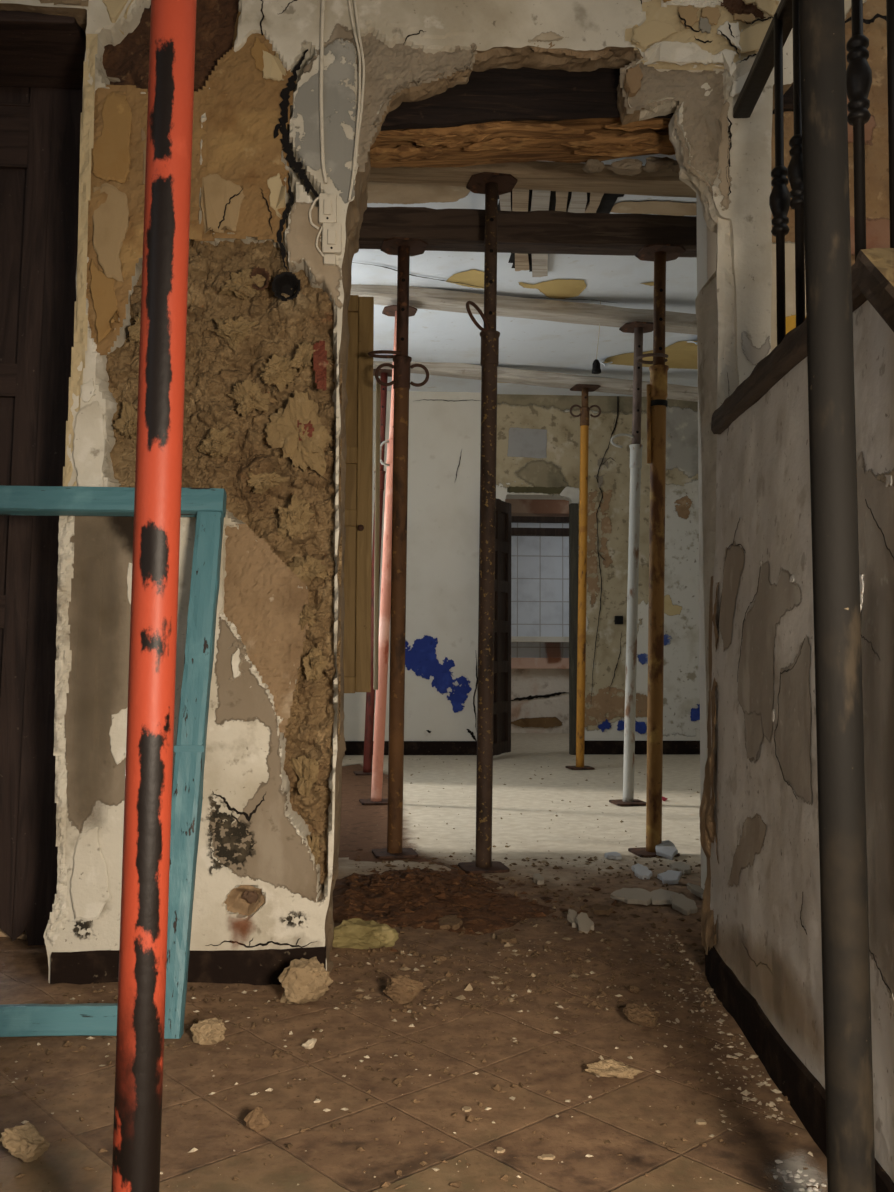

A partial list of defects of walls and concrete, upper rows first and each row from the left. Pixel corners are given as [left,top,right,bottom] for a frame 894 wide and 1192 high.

flaking render [63,0,151,488]
peeling [446,270,484,288]
peeling [518,279,586,299]
flaking render [620,0,780,210]
flaking render [847,96,877,146]
flaking render [46,516,133,946]
spalling [181,0,477,927]
crack [471,658,479,727]
flaking render [511,717,562,728]
crack [511,419,622,701]
peeling [663,406,812,955]
peeling [856,452,894,1015]